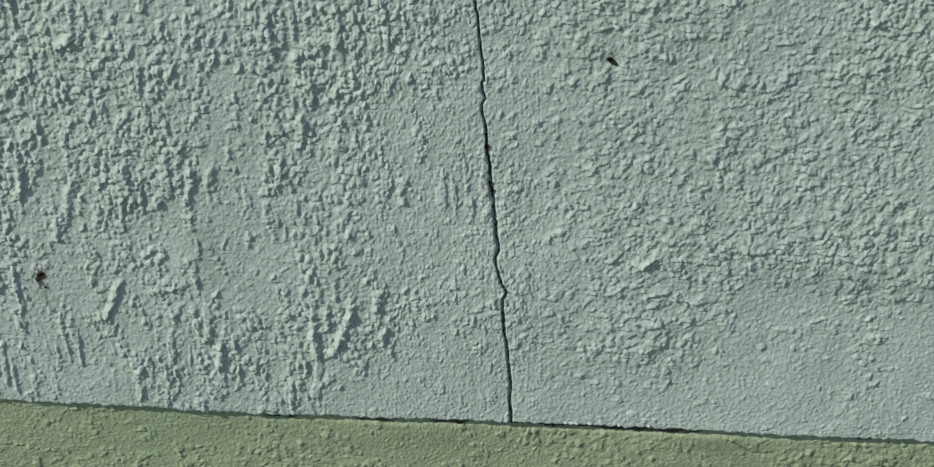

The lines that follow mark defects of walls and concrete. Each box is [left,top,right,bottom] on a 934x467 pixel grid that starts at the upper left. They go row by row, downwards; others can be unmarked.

crack [473,1,512,422]